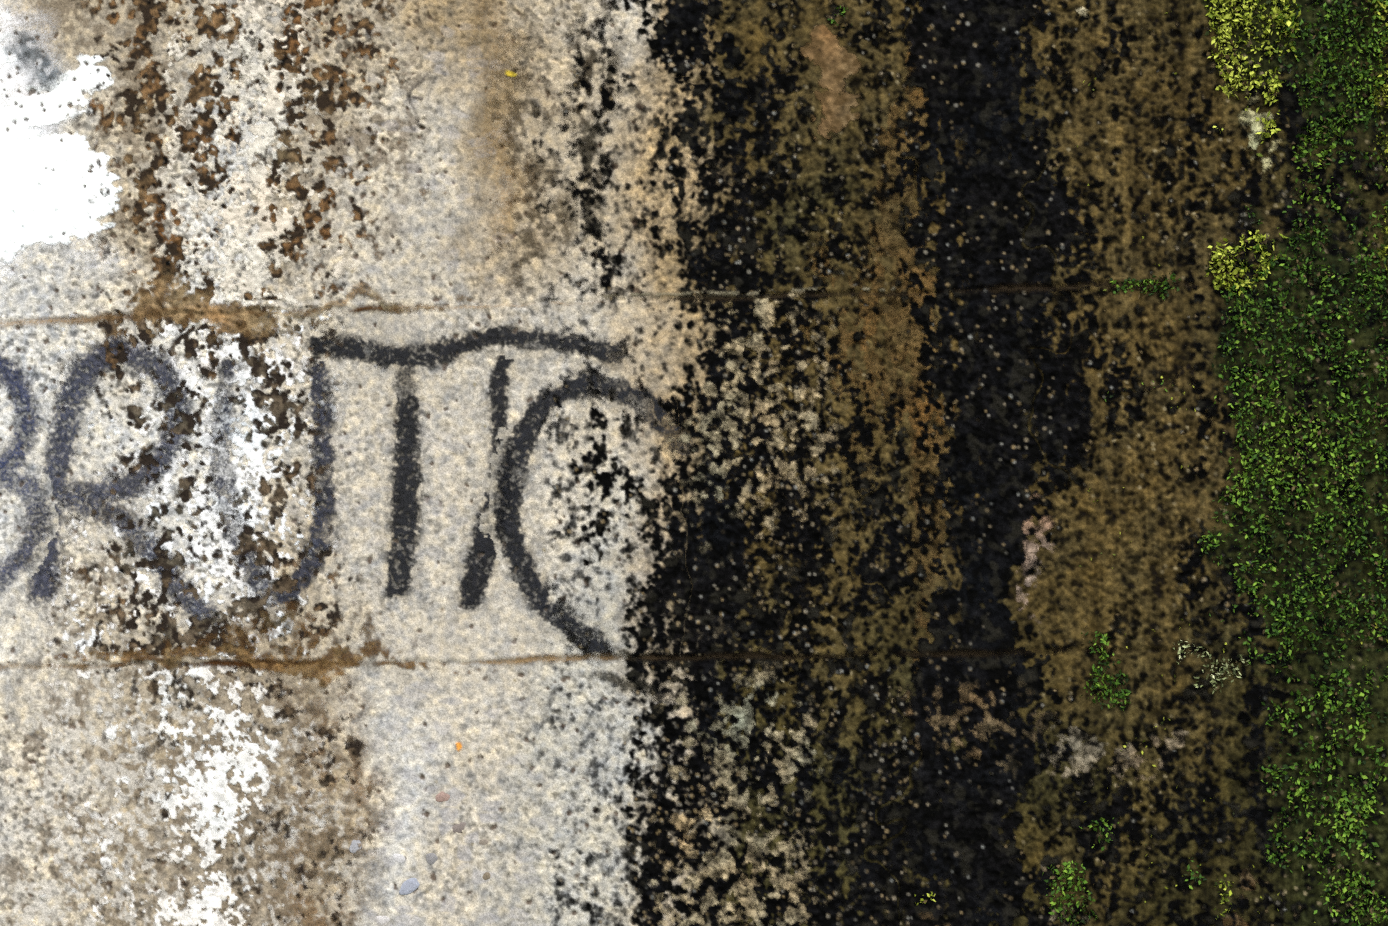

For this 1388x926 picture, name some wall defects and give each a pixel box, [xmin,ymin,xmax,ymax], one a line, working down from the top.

corrosion [112,272,420,340]
corrosion [49,602,426,687]
water stain [594,672,669,700]